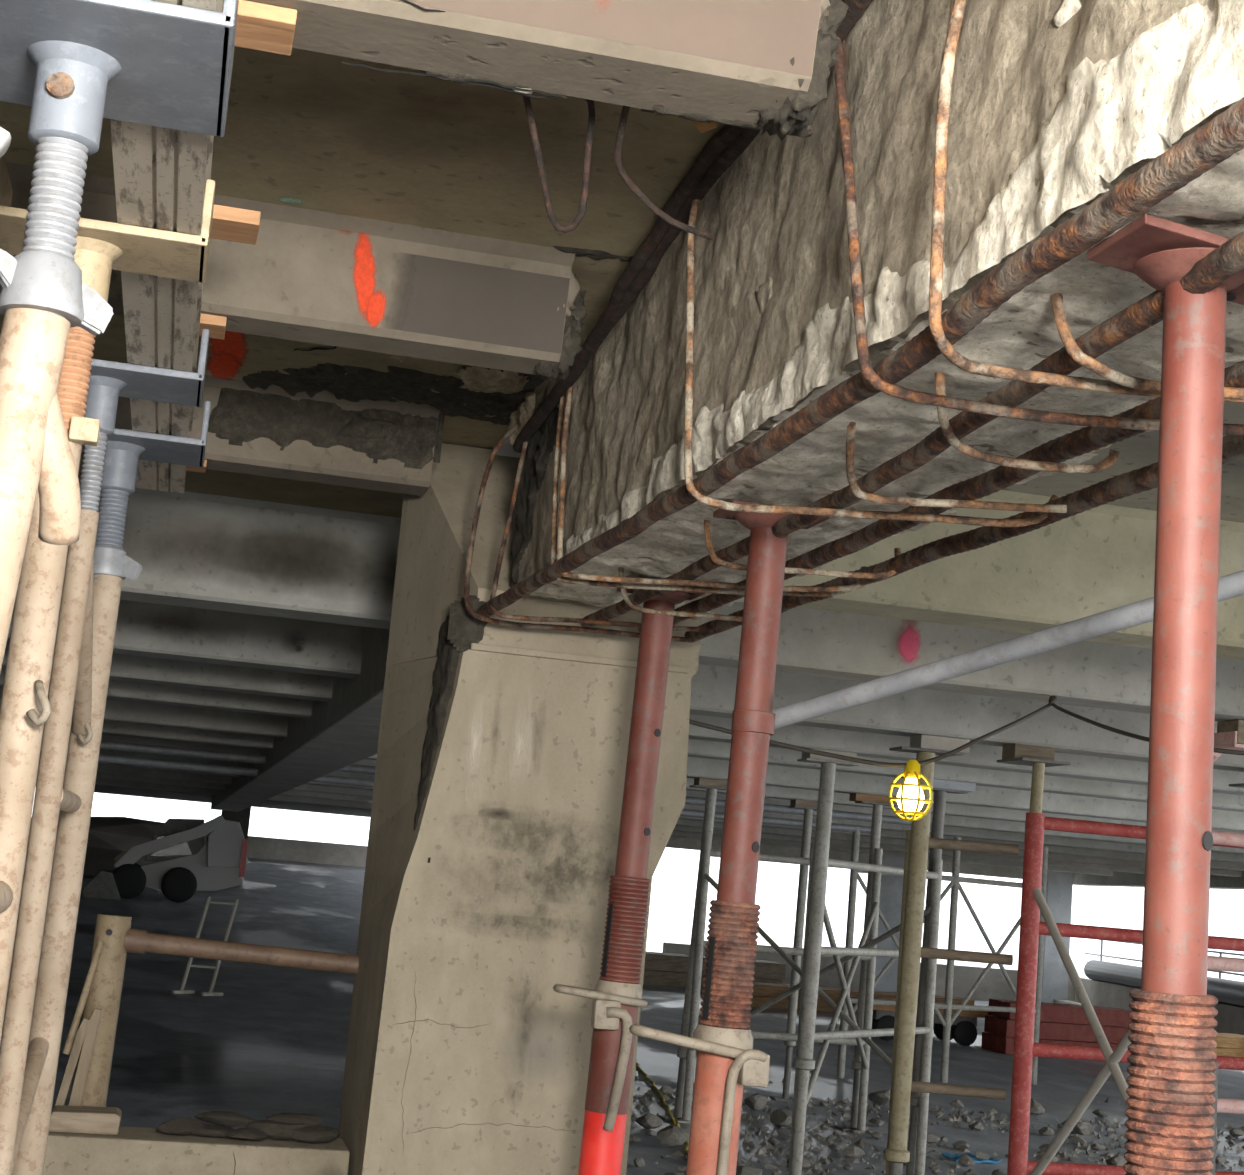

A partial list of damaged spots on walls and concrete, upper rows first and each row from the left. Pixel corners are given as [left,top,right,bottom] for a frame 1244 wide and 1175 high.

crack [401,0,445,12]
spalling [342,62,567,98]
spalling [208,270,587,587]
spalling [530,0,1244,614]